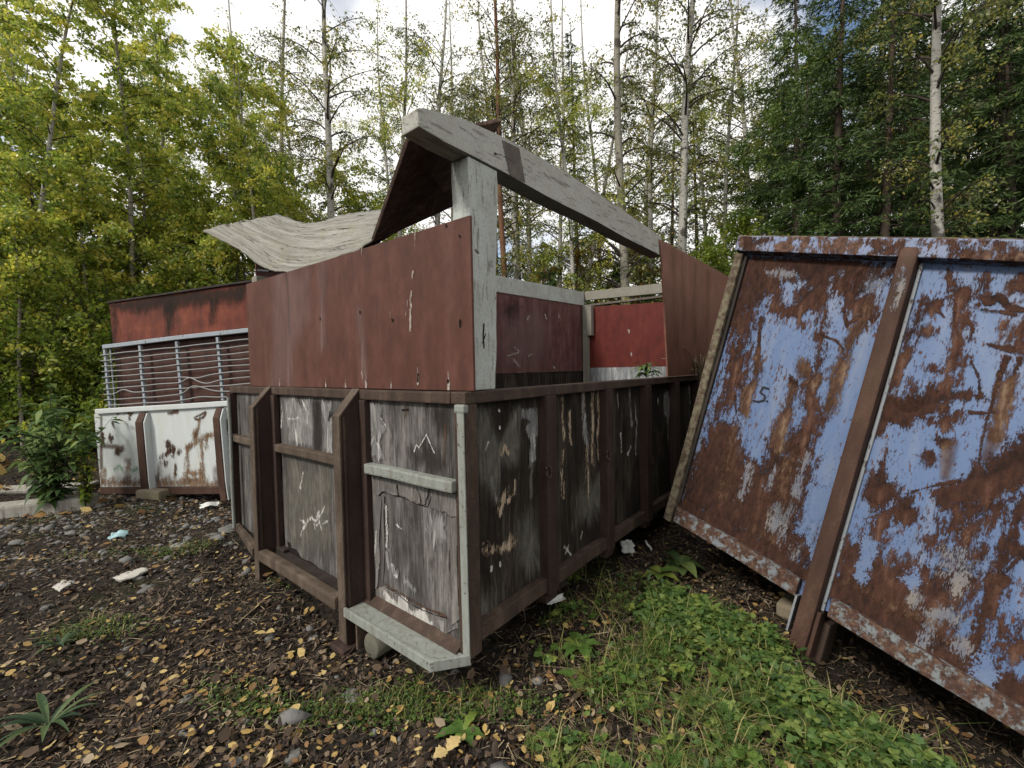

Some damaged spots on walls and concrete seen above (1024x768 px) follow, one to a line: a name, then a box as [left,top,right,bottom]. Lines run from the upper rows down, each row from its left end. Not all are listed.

leakage [112,286,246,341]
corrosion [100,412,140,487]
corrosion [155,411,218,487]
leakage [477,407,521,501]
leakage [516,515,540,577]
peeling [737,449,834,563]
corrosion [678,236,906,588]
peeling [852,534,879,586]
corrosion [828,239,1024,705]
peeling [896,538,1003,688]